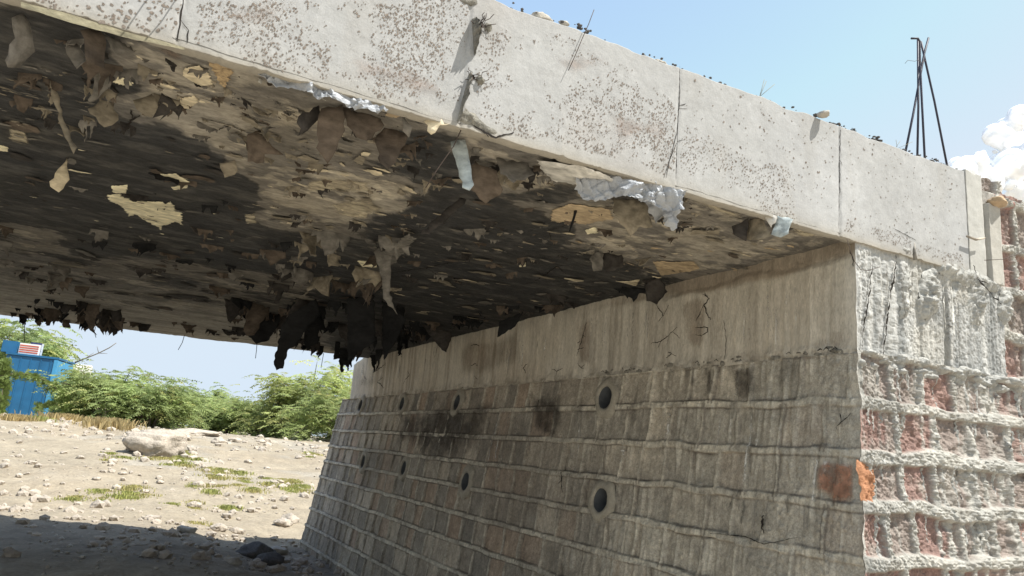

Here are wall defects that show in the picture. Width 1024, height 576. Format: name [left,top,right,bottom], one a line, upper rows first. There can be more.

peeling [0,0,844,376]
crack [652,294,726,358]
crack [849,229,915,354]
water stain [400,411,481,450]